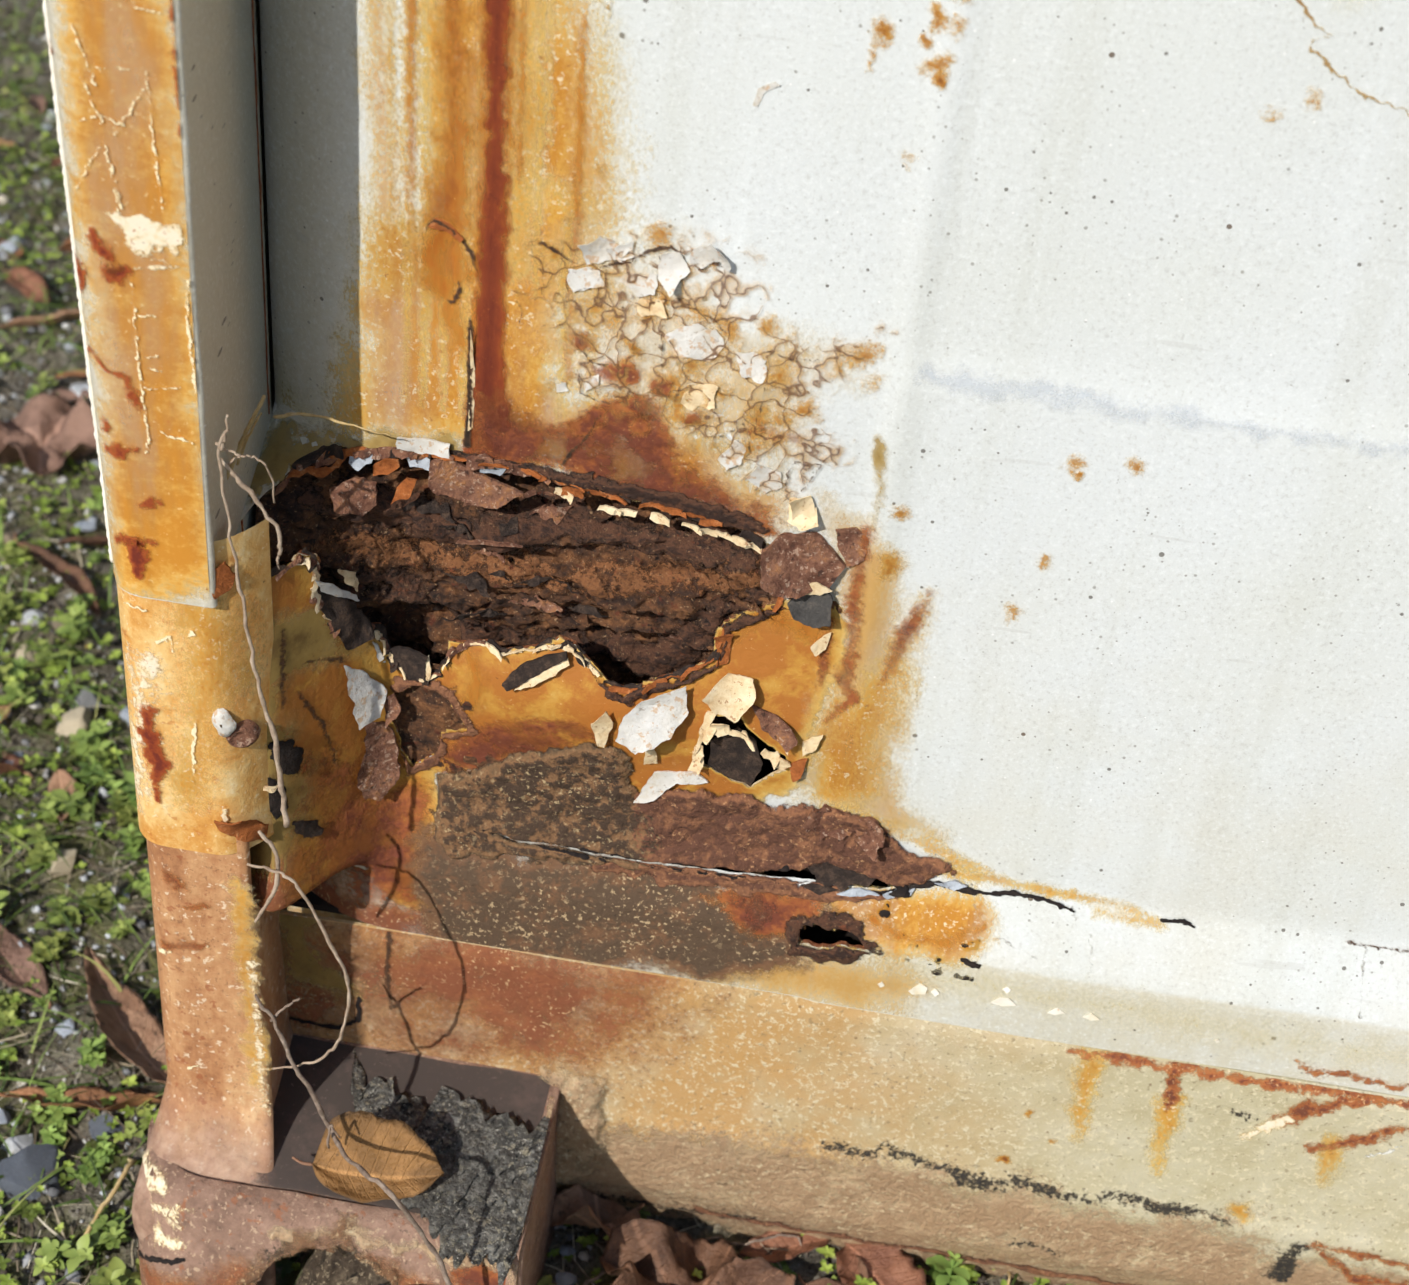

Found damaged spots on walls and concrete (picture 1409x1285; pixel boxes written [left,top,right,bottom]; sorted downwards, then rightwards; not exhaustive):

crack [1296,0,1409,116]
peeling [286,437,524,517]
rust [49,0,1166,1213]
peeling [315,569,432,801]
peeling [501,651,570,691]
peeling [591,634,823,803]
crack [891,881,1075,913]
crack [1160,918,1195,928]
crack [1347,940,1409,968]
rust [1067,1048,1409,1182]
rust [693,1206,1132,1285]
rust [1306,1241,1409,1285]